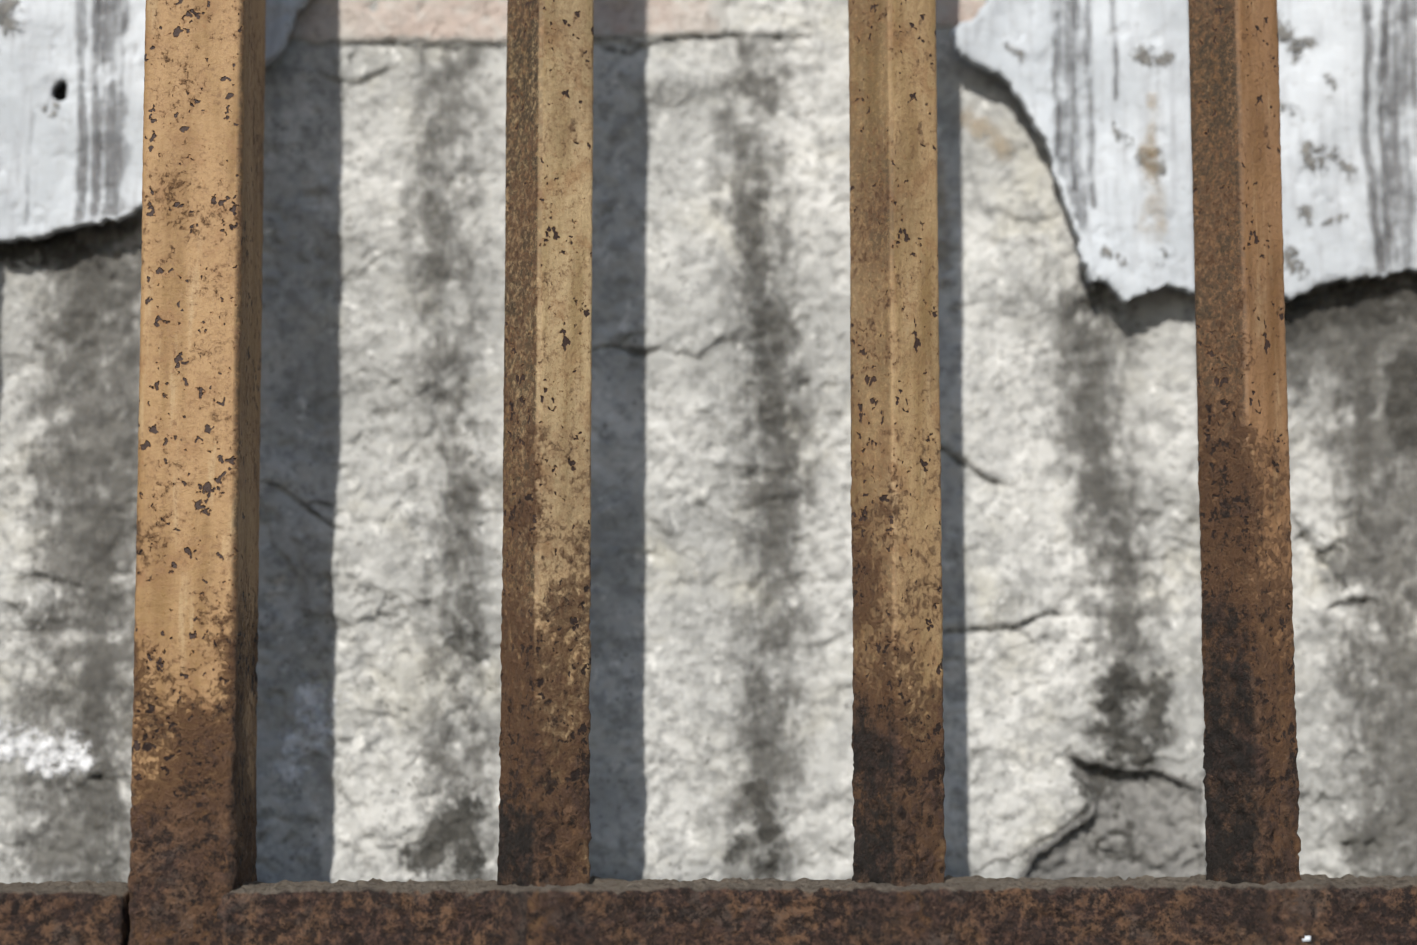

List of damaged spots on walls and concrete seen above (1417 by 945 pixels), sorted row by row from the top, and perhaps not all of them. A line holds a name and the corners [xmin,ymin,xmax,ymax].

peeling [0,0,146,243]
damp [78,0,128,58]
damp [416,46,479,314]
peeling [936,0,1195,303]
peeling [1277,0,1417,302]
damp [0,68,142,883]
damp [399,321,491,881]
damp [719,35,812,880]
damp [1054,282,1175,865]